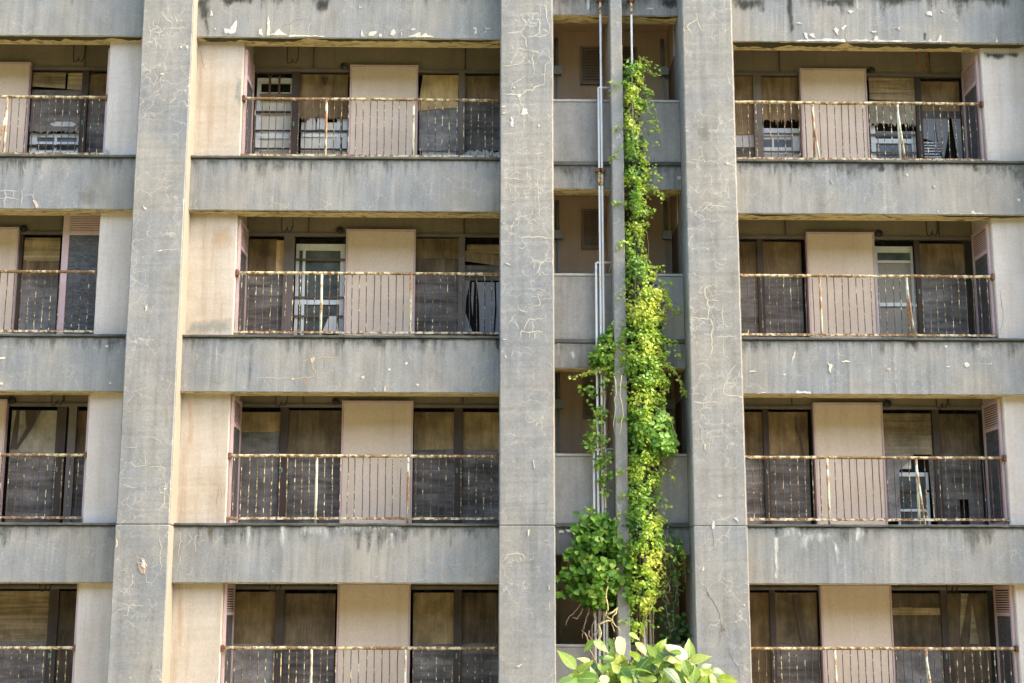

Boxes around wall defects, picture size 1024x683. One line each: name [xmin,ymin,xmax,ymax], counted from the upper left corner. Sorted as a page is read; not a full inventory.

crack [141,15,183,89]
peeling [202,9,499,43]
damp [737,0,765,11]
peeling [733,10,1024,49]
crack [502,4,551,339]
crack [665,285,742,465]
crack [120,438,167,509]
spalling [136,555,147,574]
crack [121,533,196,628]
damp [774,527,821,578]